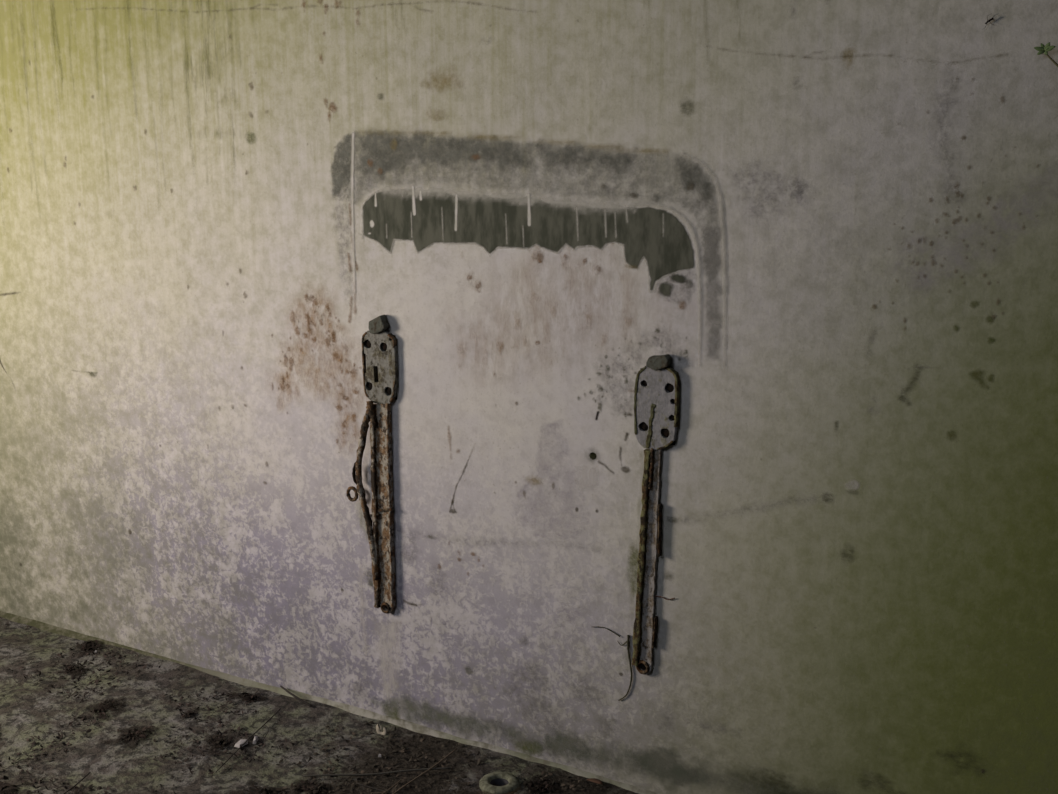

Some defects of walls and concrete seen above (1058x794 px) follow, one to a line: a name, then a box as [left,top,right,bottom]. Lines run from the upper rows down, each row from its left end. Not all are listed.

peeling [333,133,720,355]
corrosion [278,295,369,432]
corrosion [634,366,646,435]
corrosion [665,366,680,427]
corrosion [648,440,673,489]